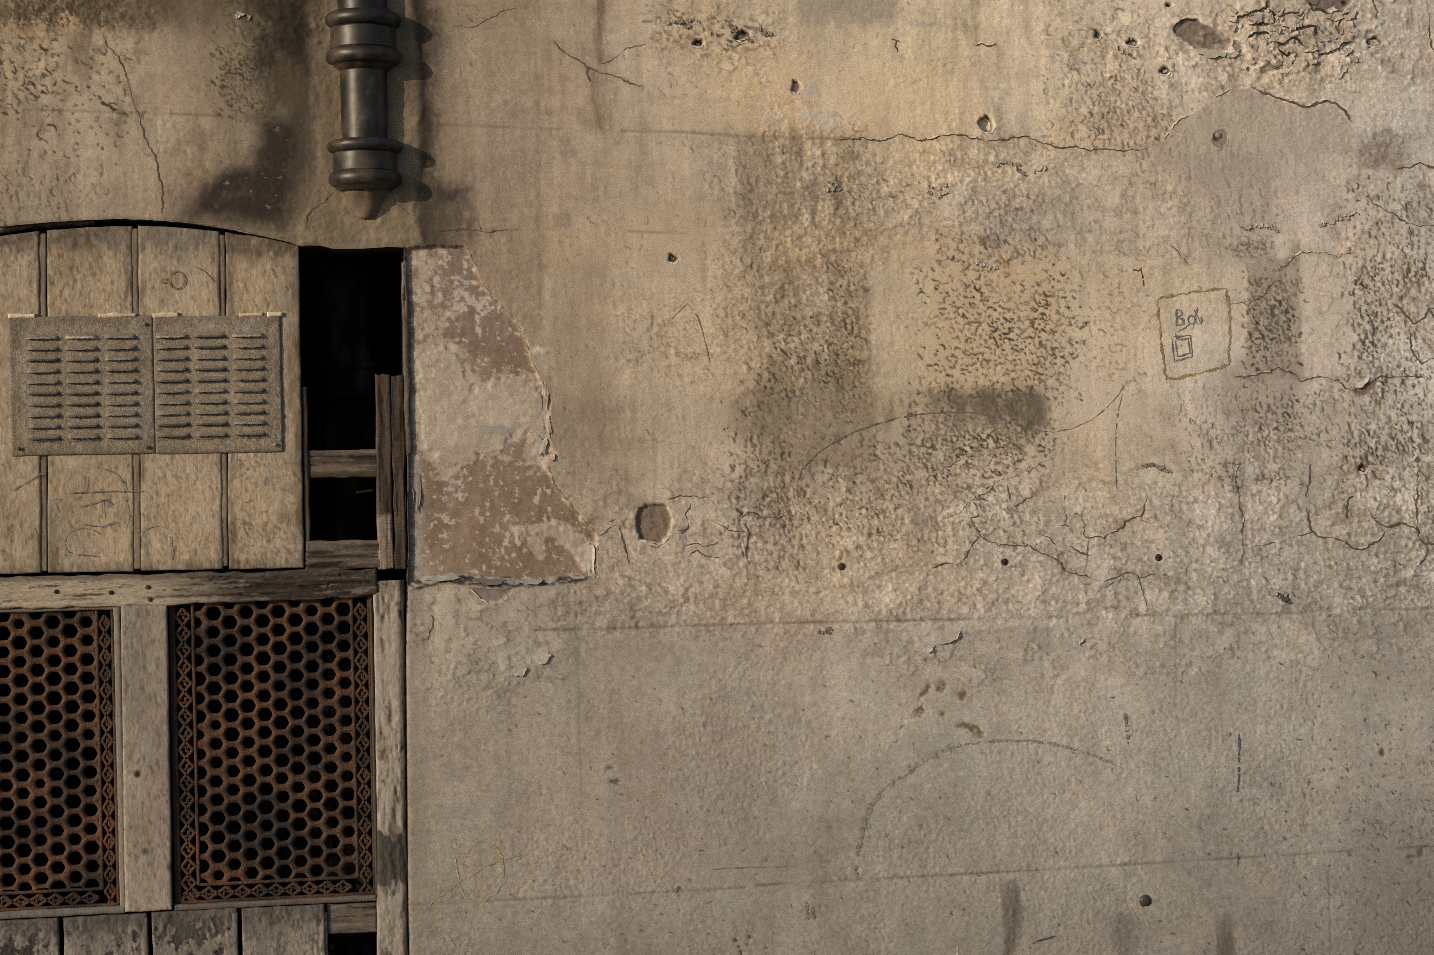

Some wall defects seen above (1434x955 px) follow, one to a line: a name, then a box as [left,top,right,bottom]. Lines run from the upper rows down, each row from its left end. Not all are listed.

crack [554,41,646,86]
water stain [175,0,334,238]
water stain [406,0,470,250]
crack [1367,192,1434,251]
crack [1228,251,1434,392]
flaking render [405,245,598,603]
spalling [635,502,673,550]
crack [933,485,1156,607]
crack [1230,462,1434,567]
water stain [996,874,1024,955]
water stain [1102,867,1148,955]
water stain [1213,911,1239,955]